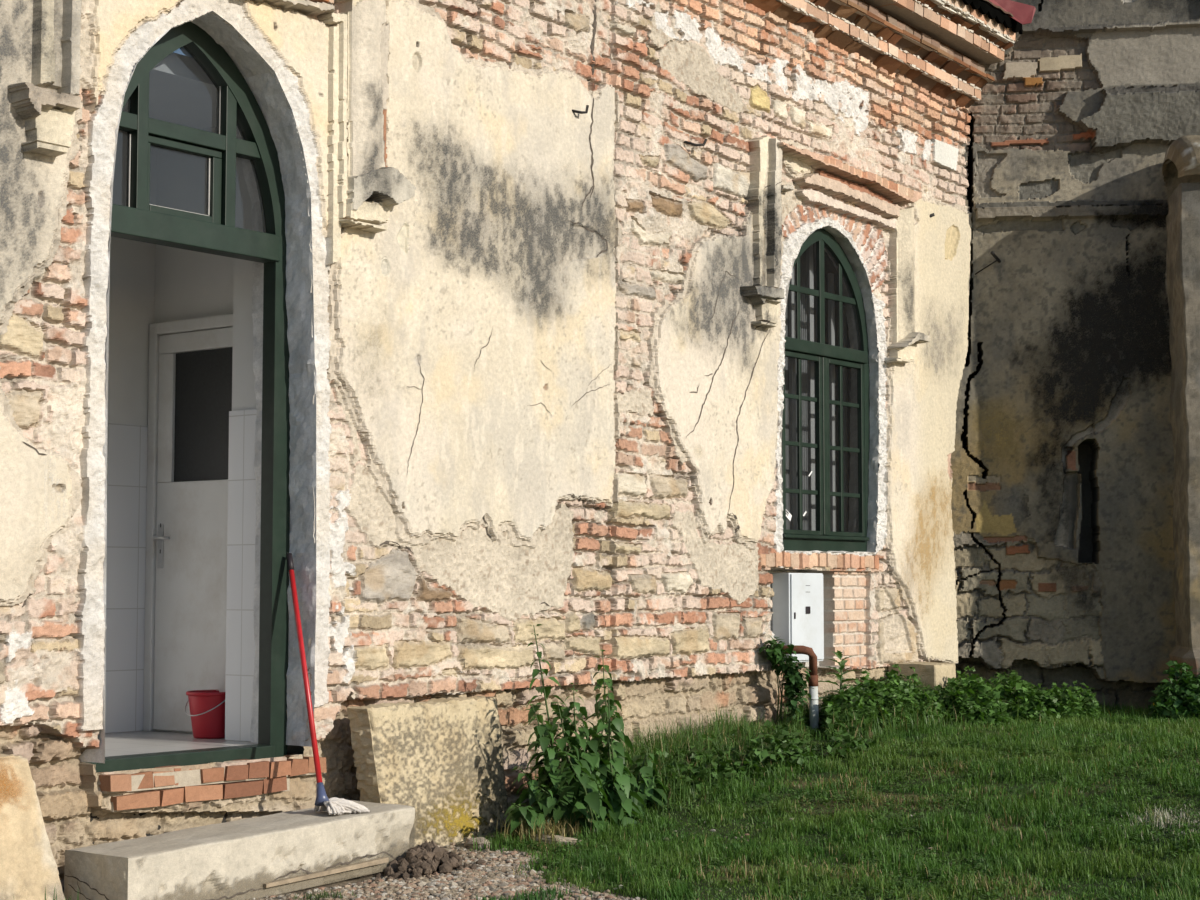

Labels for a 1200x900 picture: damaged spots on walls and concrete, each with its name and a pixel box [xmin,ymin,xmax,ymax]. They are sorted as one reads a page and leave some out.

leakage [0,0,82,296]
flaking render [250,0,353,159]
leakage [283,0,416,263]
leakage [416,123,616,317]
crack [568,0,608,257]
flaking render [0,0,184,747]
flaking render [305,0,1127,741]
crack [687,271,771,535]
crack [956,111,1008,656]
leakage [1013,199,1172,540]